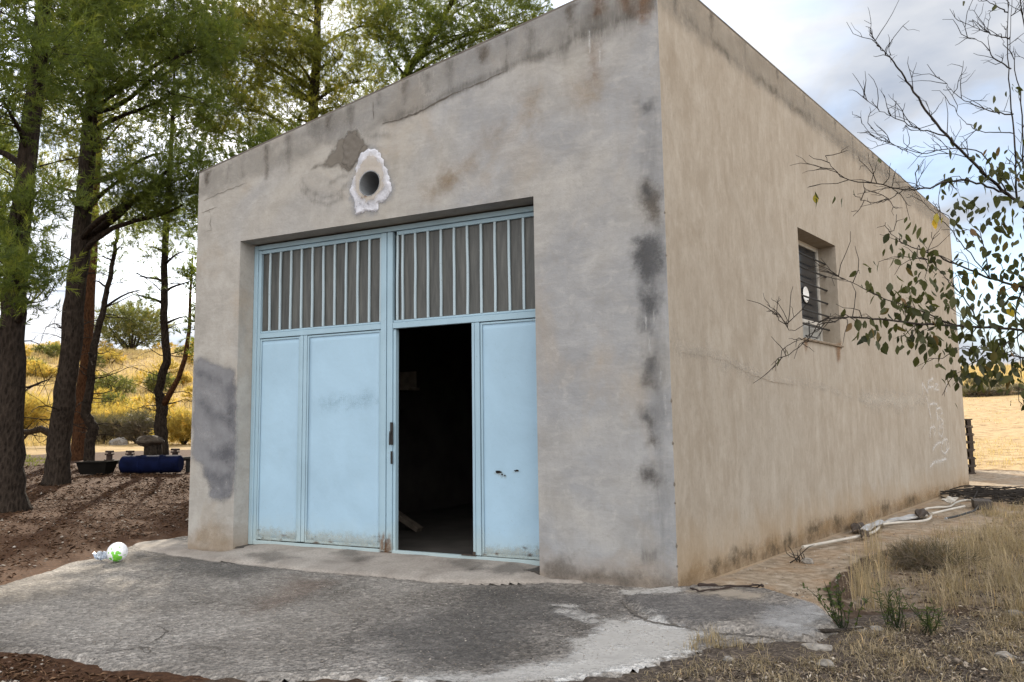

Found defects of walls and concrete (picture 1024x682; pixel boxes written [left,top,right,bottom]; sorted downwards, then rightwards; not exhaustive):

crack [373,71,506,124]
spalling [315,130,368,171]
damp [643,182,659,218]
damp [635,239,662,280]